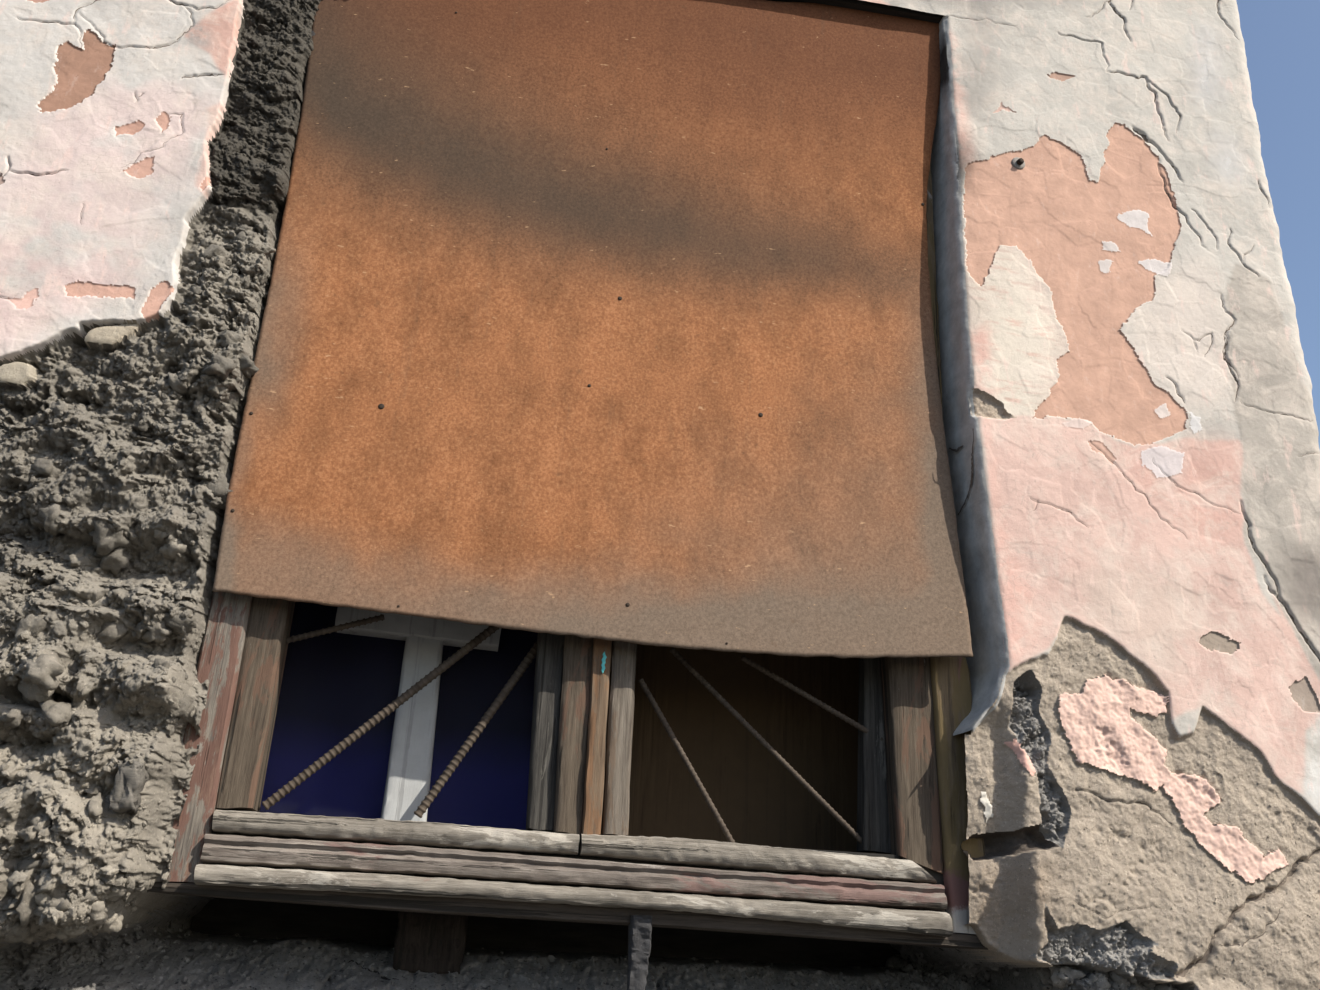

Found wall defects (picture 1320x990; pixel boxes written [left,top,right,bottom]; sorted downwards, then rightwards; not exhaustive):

crack [19,0,229,49]
crack [1065,0,1258,275]
peeling [963,122,1202,478]
crack [1184,299,1304,420]
spalling [0,0,321,948]
crack [1094,445,1320,661]
crack [1082,790,1172,826]
spalling [960,616,1320,990]
crack [1166,849,1320,980]